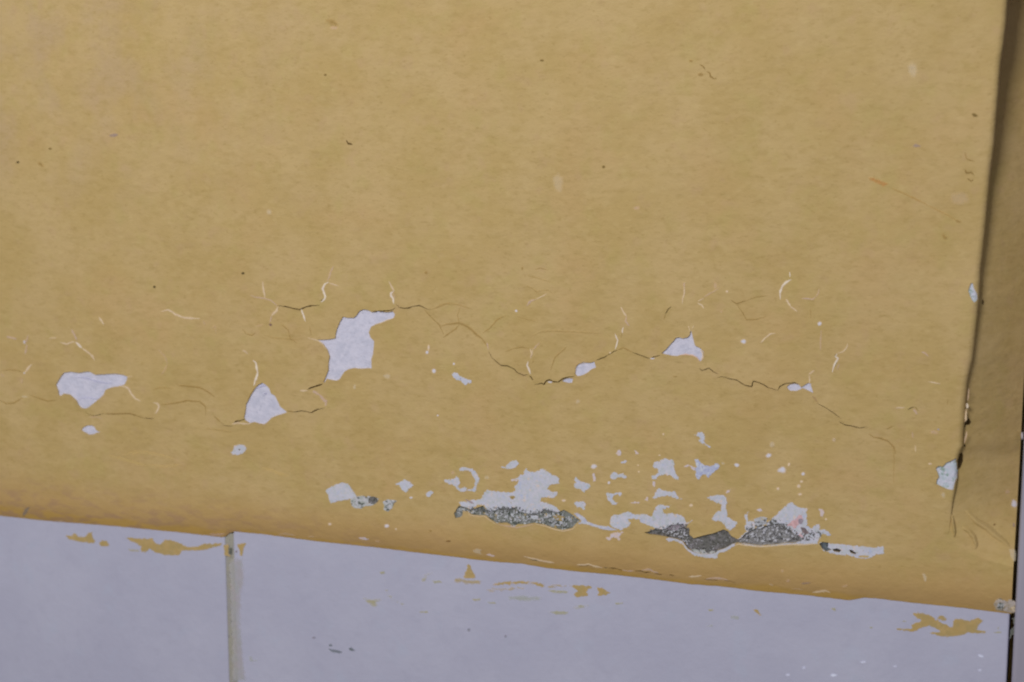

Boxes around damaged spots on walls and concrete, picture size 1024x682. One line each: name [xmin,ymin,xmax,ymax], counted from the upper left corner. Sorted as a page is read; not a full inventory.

crack [0,329,94,404]
peeling [57,372,140,409]
crack [95,385,244,426]
peeling [232,383,286,424]
crack [243,266,338,385]
peeling [309,308,395,389]
crack [389,282,677,385]
crack [664,272,819,343]
crack [704,368,918,454]
spalling [928,390,971,490]
peeling [325,479,413,511]
peeling [444,450,884,559]